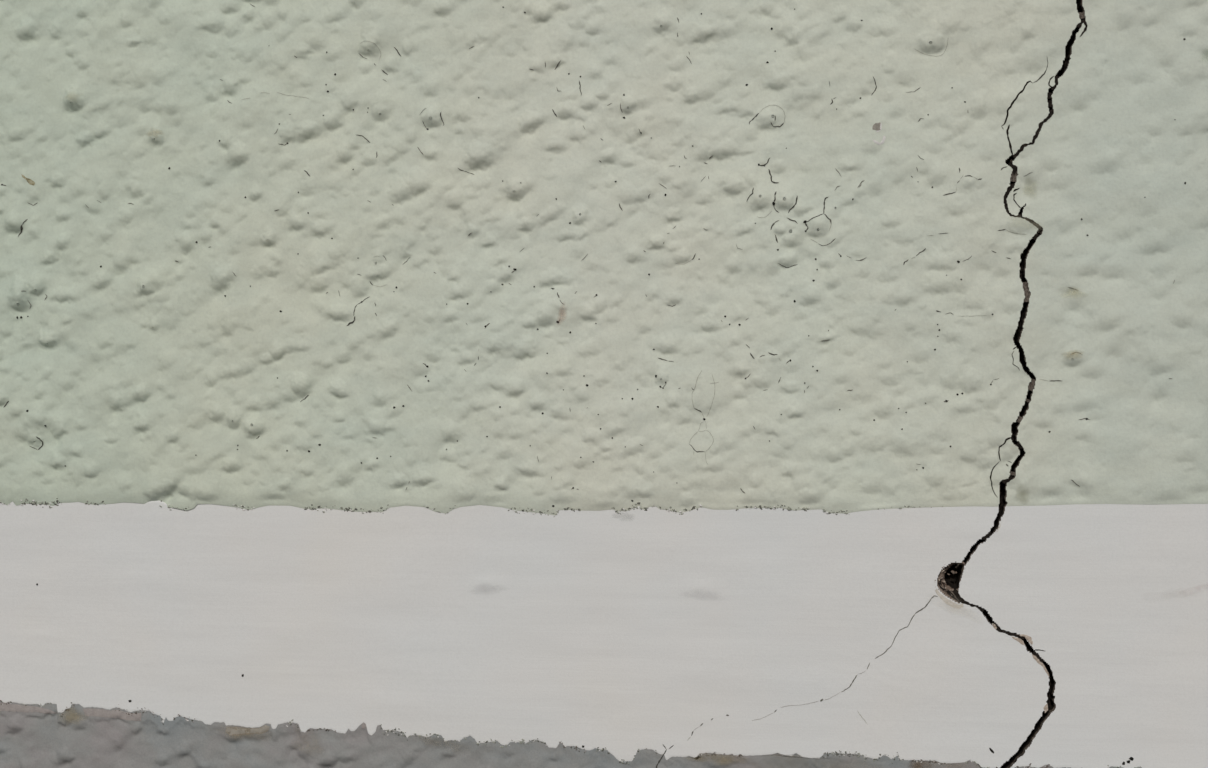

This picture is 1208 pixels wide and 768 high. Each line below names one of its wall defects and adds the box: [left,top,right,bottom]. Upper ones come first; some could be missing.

crack [656,0,1088,768]